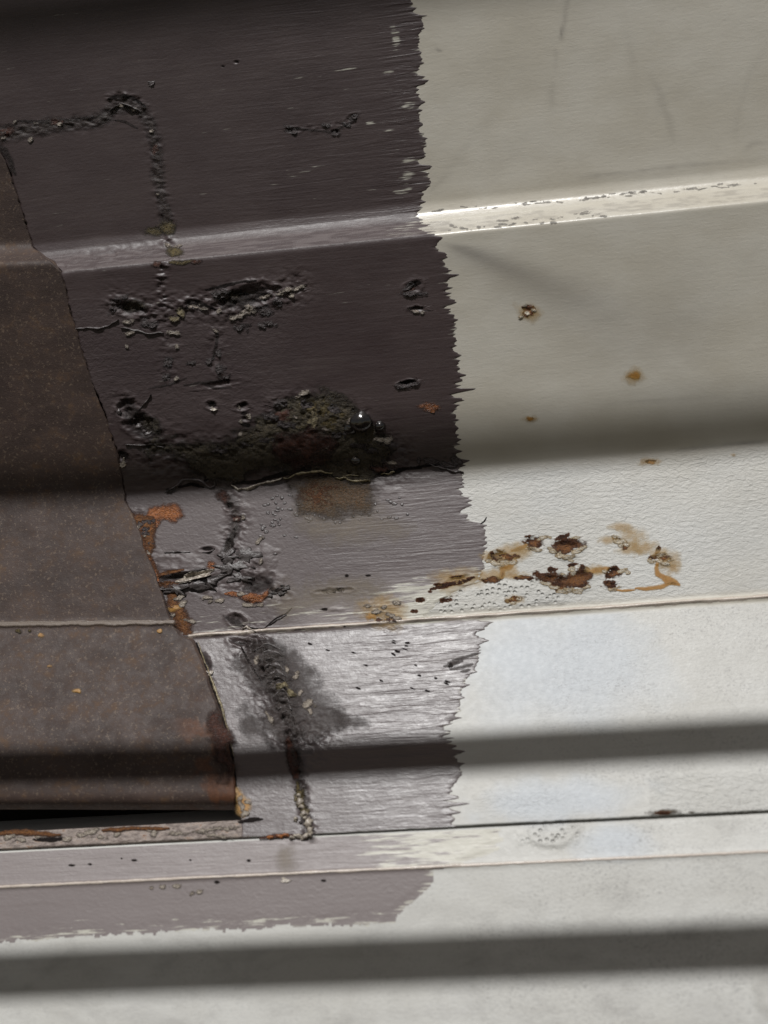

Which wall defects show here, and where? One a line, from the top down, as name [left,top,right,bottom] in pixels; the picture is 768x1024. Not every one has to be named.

rust [518,305,537,319]
rust [132,503,196,635]
spalling [159,541,263,607]
peeling [266,585,290,597]
rust [364,526,680,623]
damp [235,638,364,746]
rust [0,711,312,850]